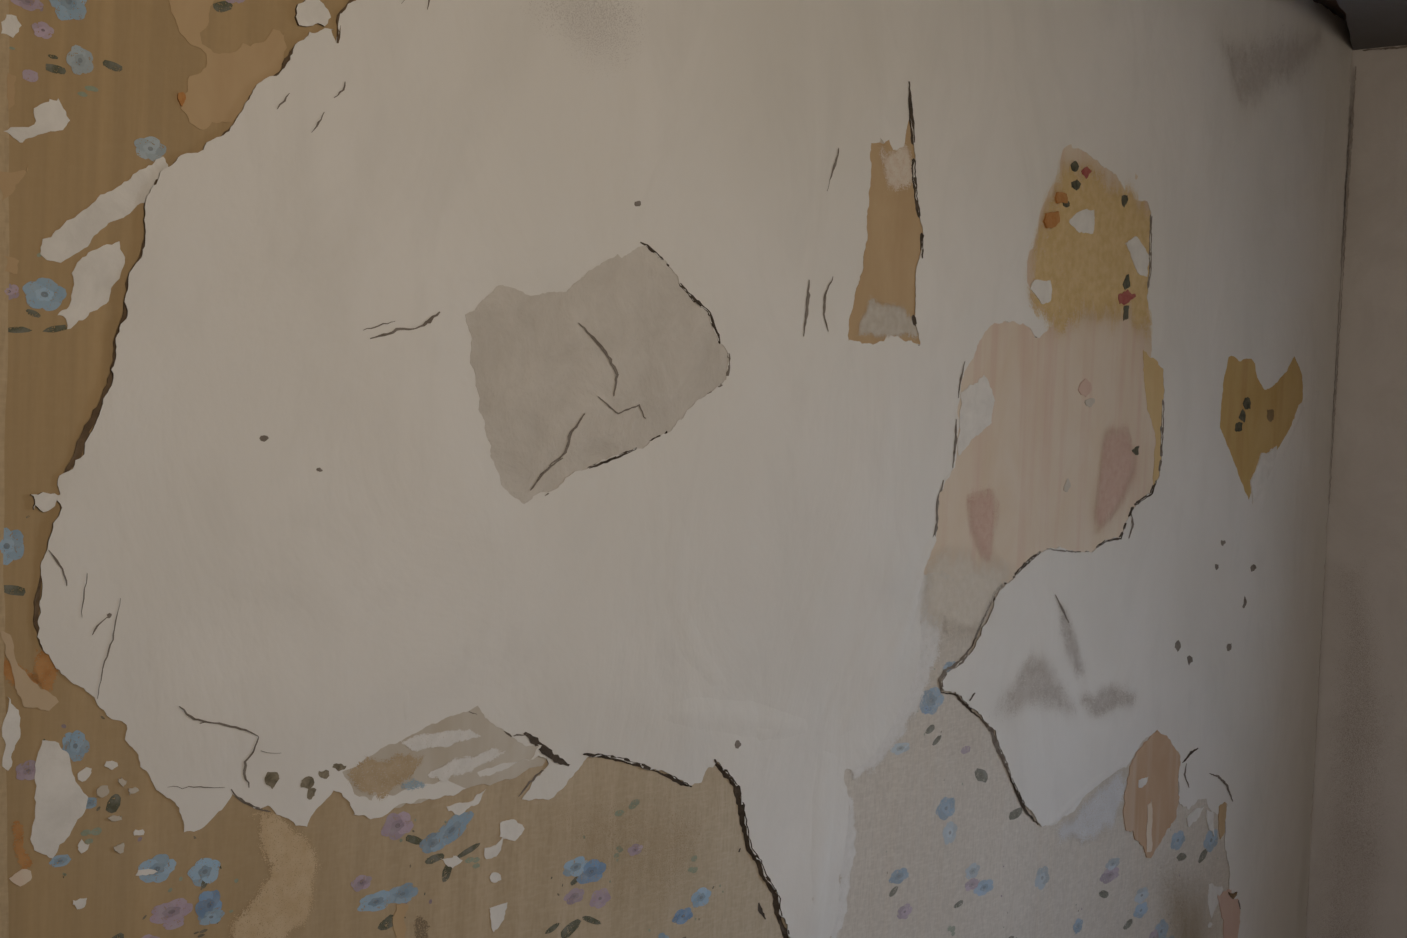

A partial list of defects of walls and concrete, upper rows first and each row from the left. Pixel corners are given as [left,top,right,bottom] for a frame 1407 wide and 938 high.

peeling [4,99,70,143]
peeling [169,0,331,130]
peeling [40,157,168,329]
peeling [848,121,923,345]
spalling [465,245,728,504]
peeling [918,144,1164,645]
peeling [1220,356,1303,504]
peeling [30,492,58,512]
peeling [30,740,144,858]
spalling [300,706,546,815]
peeling [484,819,524,883]
peeling [1123,730,1227,858]